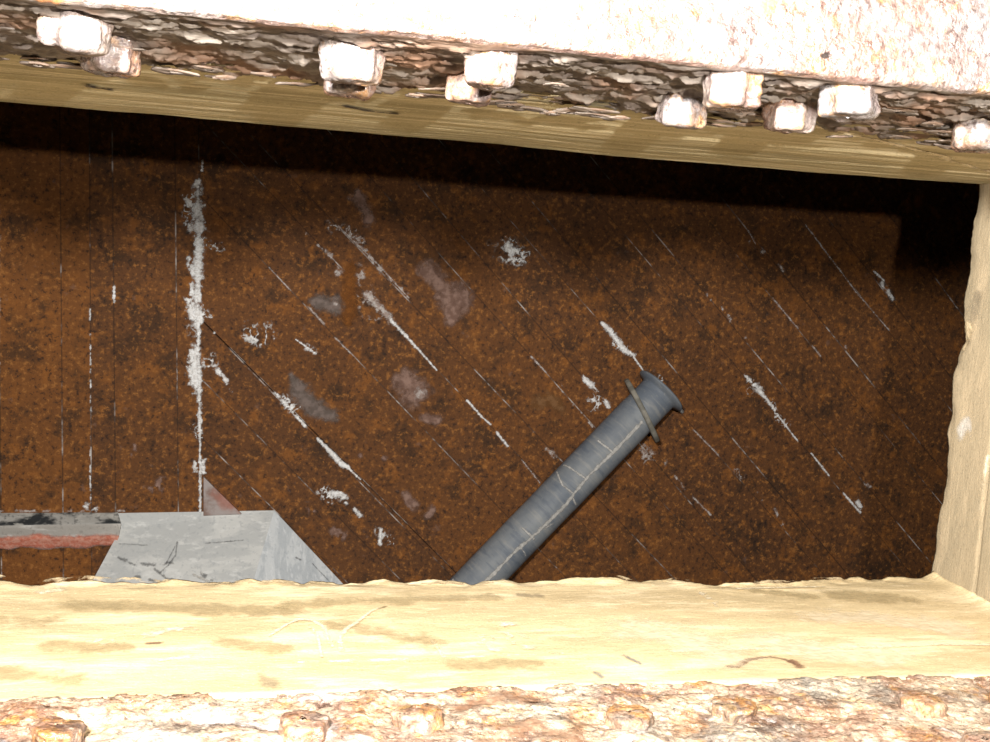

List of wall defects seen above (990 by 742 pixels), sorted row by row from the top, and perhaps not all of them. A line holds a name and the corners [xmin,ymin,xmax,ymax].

peeling [151,65,237,80]
peeling [250,72,318,87]
peeling [405,87,446,99]
peeling [497,103,655,121]
damp [502,241,530,265]
damp [184,160,229,512]
corrosion [726,656,803,668]
corrosion [451,691,538,711]
corrosion [500,717,589,742]